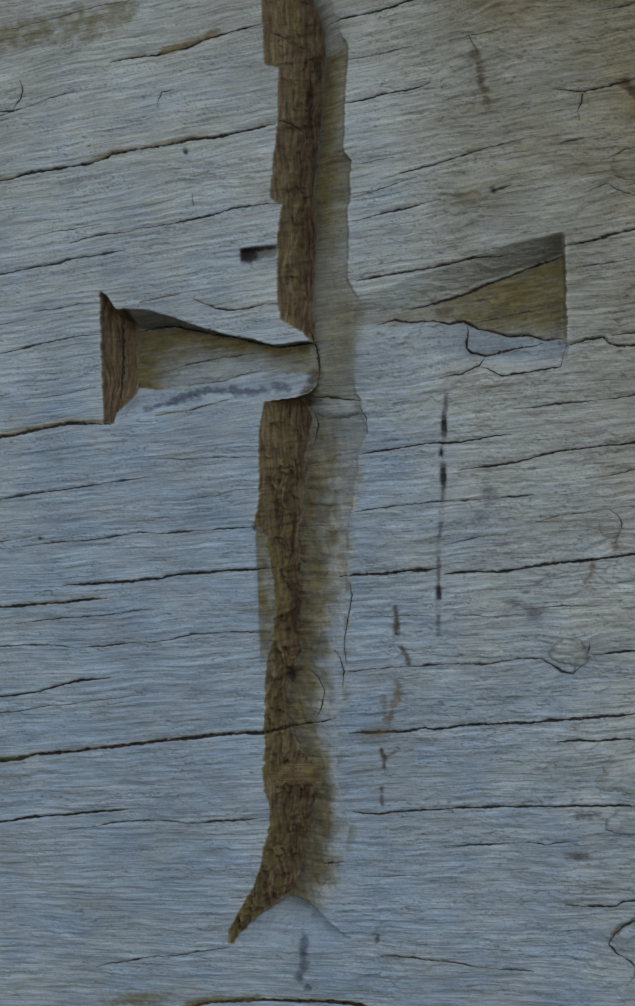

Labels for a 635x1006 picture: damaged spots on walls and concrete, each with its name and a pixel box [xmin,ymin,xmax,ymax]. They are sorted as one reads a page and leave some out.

crack [344,82,430,104]
crack [557,79,633,145]
crack [0,119,315,181]
crack [351,138,523,221]
crack [589,147,635,195]
crack [359,228,635,378]
crack [0,295,512,455]
crack [516,394,635,409]
crack [461,441,635,470]
crack [354,494,533,512]
crack [0,506,635,762]
crack [567,900,635,986]